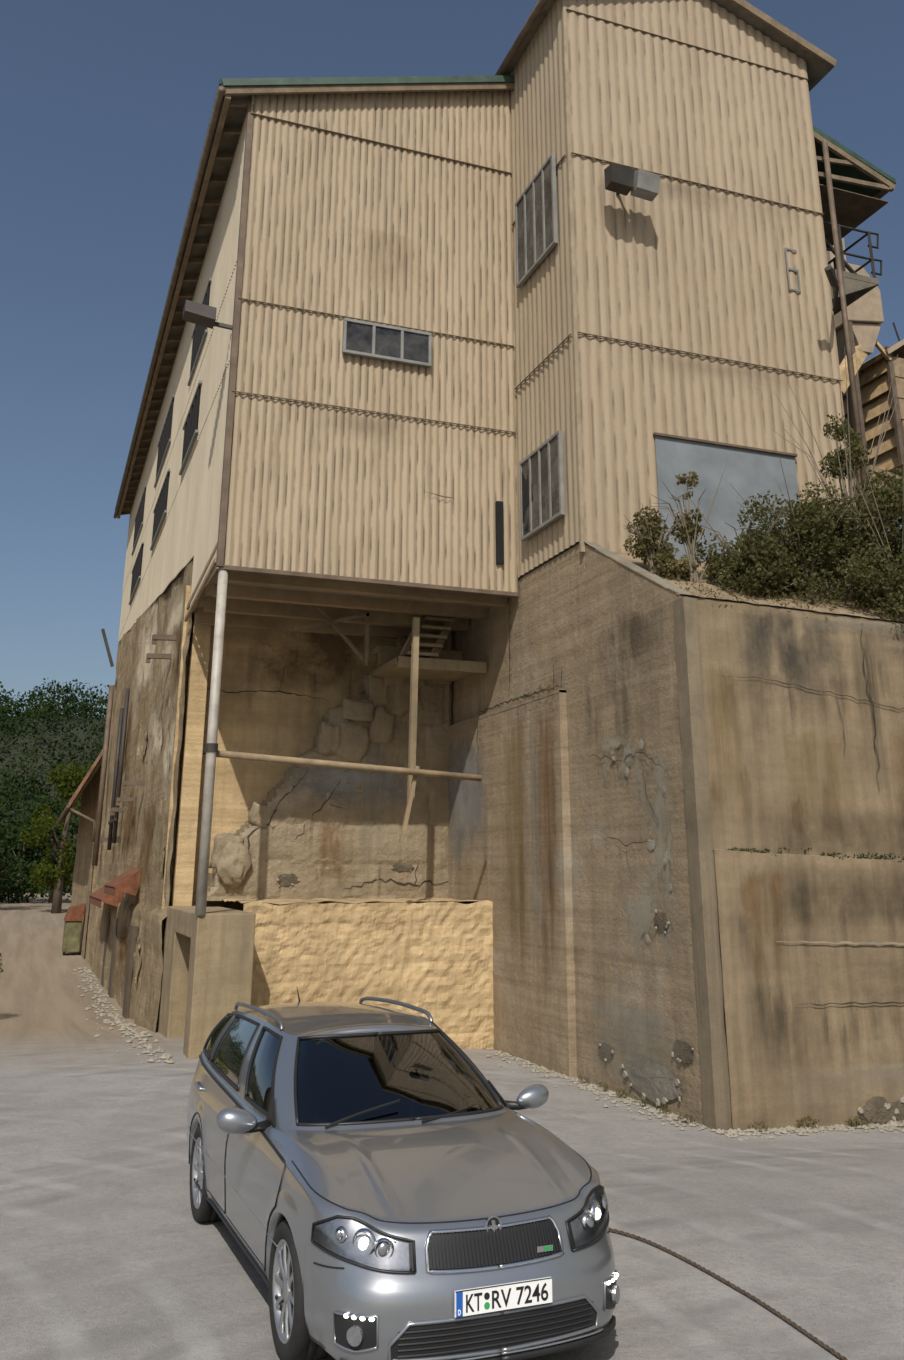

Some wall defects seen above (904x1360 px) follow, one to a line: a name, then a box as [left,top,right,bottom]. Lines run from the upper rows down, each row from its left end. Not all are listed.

crack [721,633,904,785]
crack [345,863,448,889]